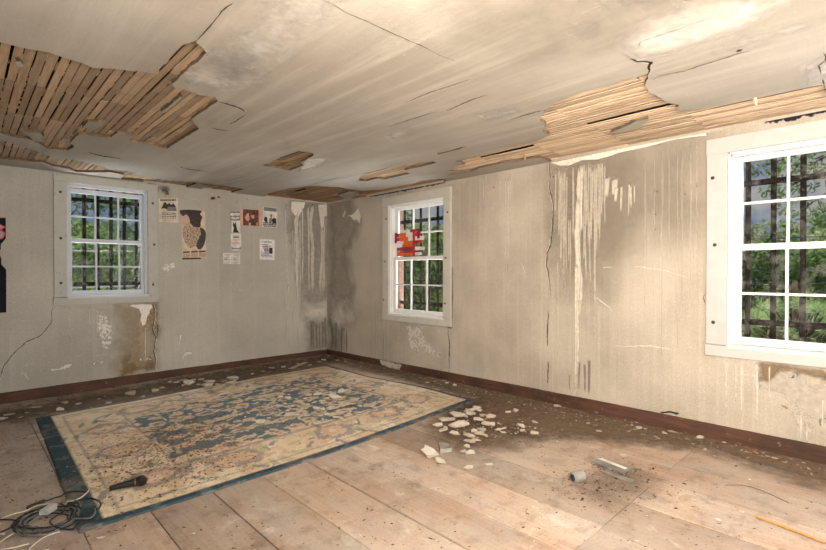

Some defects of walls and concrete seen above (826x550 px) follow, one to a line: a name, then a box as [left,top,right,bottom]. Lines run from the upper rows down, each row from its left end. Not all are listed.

flaking render [0,41,243,193]
flaking render [263,73,826,230]
crack [0,306,56,379]
peeling [130,304,153,326]
damp [285,204,356,349]
crack [545,162,554,383]
damp [555,164,682,389]
peeling [758,371,826,425]